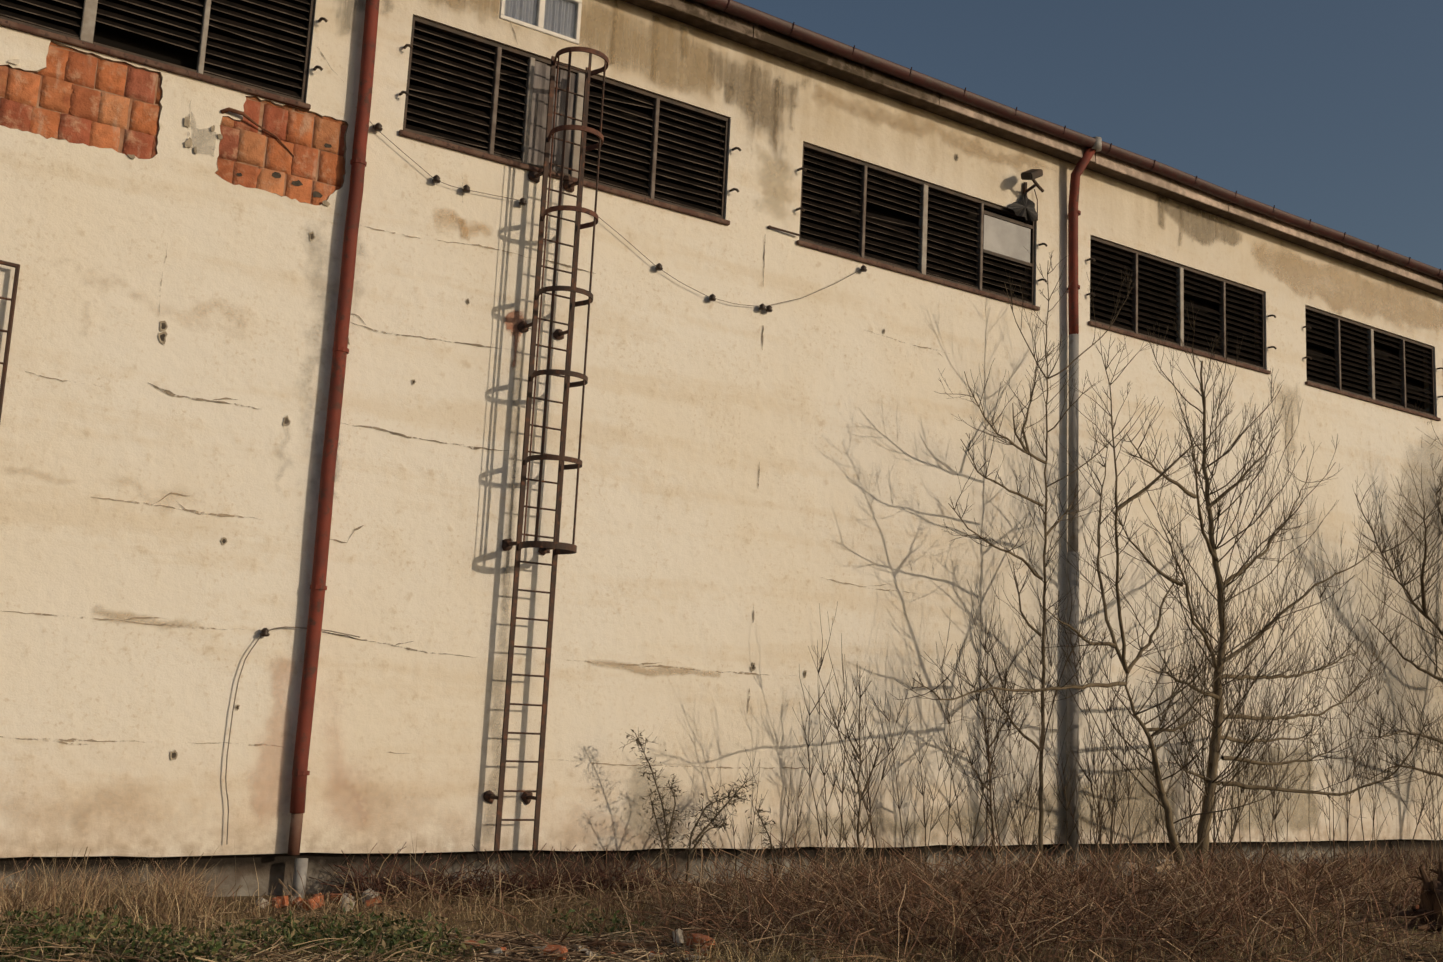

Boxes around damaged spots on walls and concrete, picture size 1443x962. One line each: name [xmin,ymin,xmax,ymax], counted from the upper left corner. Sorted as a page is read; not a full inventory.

flaking render [0,41,163,159]
peeling [184,102,197,154]
flaking render [211,96,349,206]
corrosion [505,311,525,367]